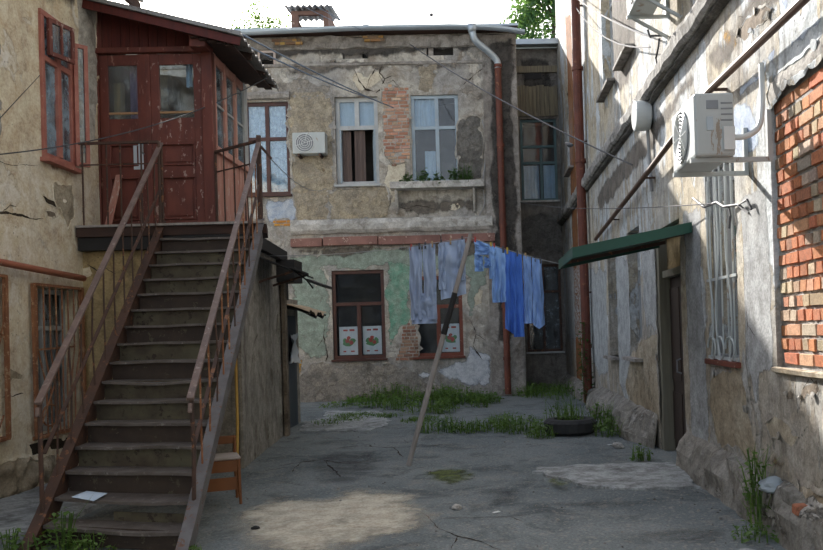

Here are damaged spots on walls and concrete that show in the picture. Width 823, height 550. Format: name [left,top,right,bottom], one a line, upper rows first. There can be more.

flaking render [735,3,773,44]
crack [354,66,395,93]
flaking render [766,31,823,109]
flaking render [379,64,439,166]
crack [0,205,41,220]
flaking render [290,247,455,402]
flaking render [783,379,820,401]